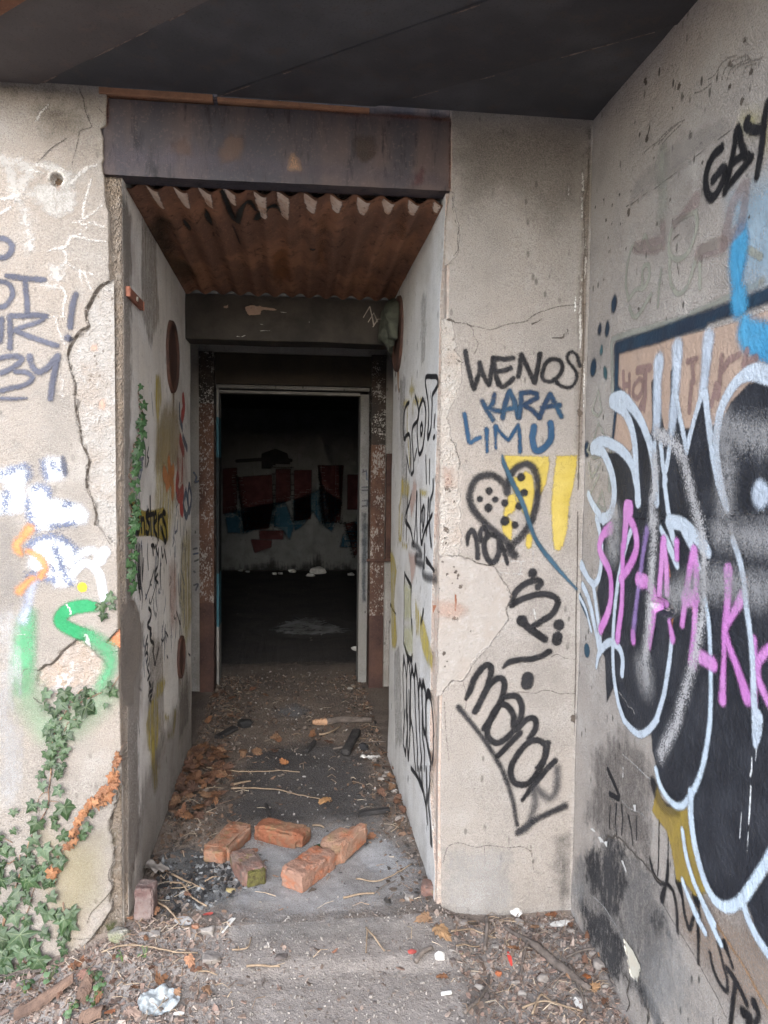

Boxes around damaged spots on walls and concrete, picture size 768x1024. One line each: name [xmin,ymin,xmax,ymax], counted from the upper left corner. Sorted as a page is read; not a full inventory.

crack [456,304,586,354]
flaking render [21,600,164,767]